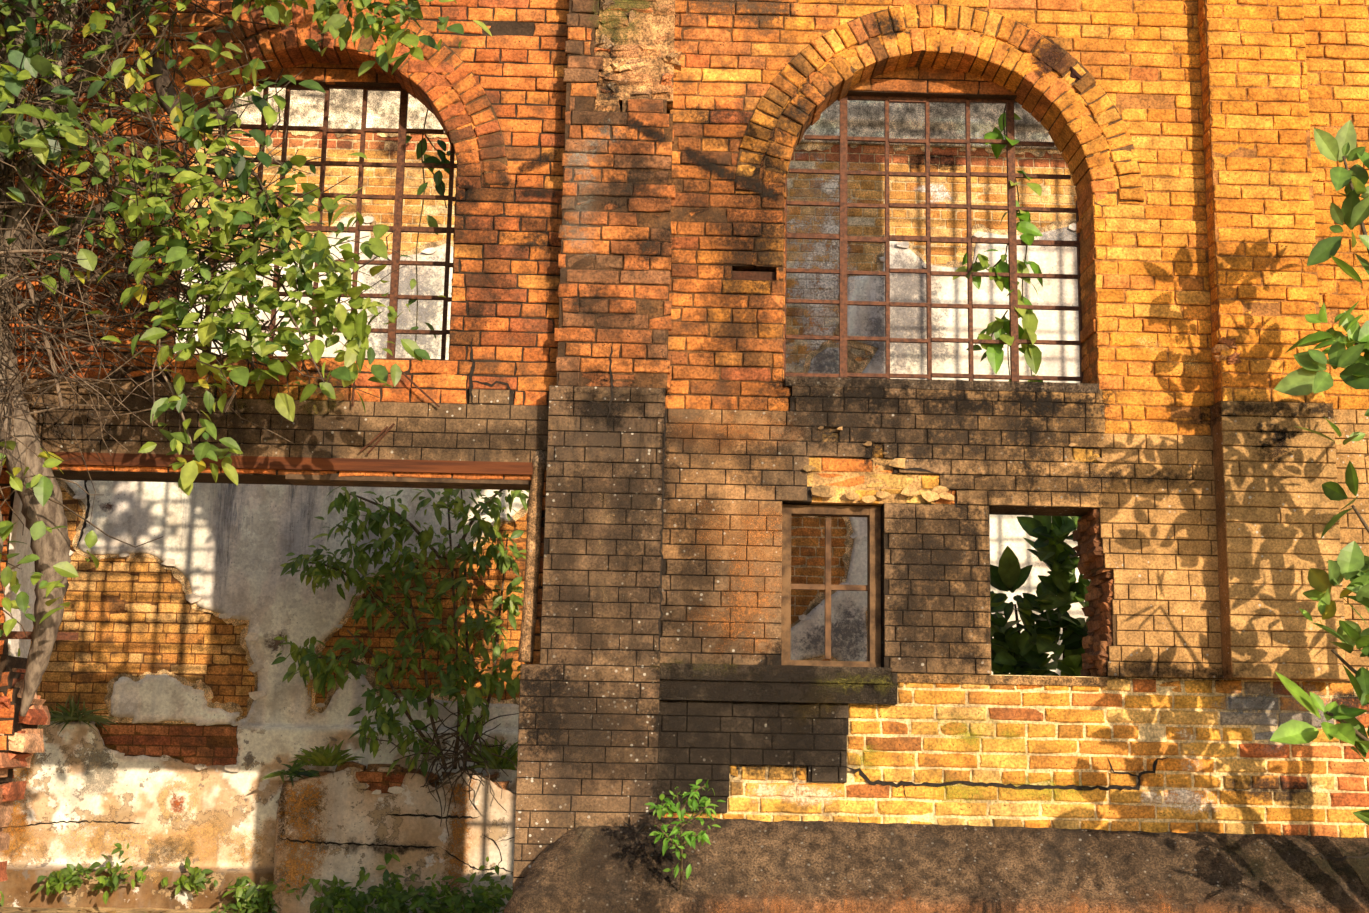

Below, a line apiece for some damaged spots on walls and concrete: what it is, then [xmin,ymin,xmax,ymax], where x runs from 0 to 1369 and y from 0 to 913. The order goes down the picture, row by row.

water stain [823,175,839,202]
water stain [918,184,950,202]
mould [1199,401,1333,461]
water stain [518,218,1197,818]
flaking render [791,426,956,625]
peeling [37,486,267,772]
water stain [2,752,47,860]
water stain [80,750,115,796]
water stain [61,779,475,894]
water stain [565,830,691,913]
crack [845,757,1168,799]